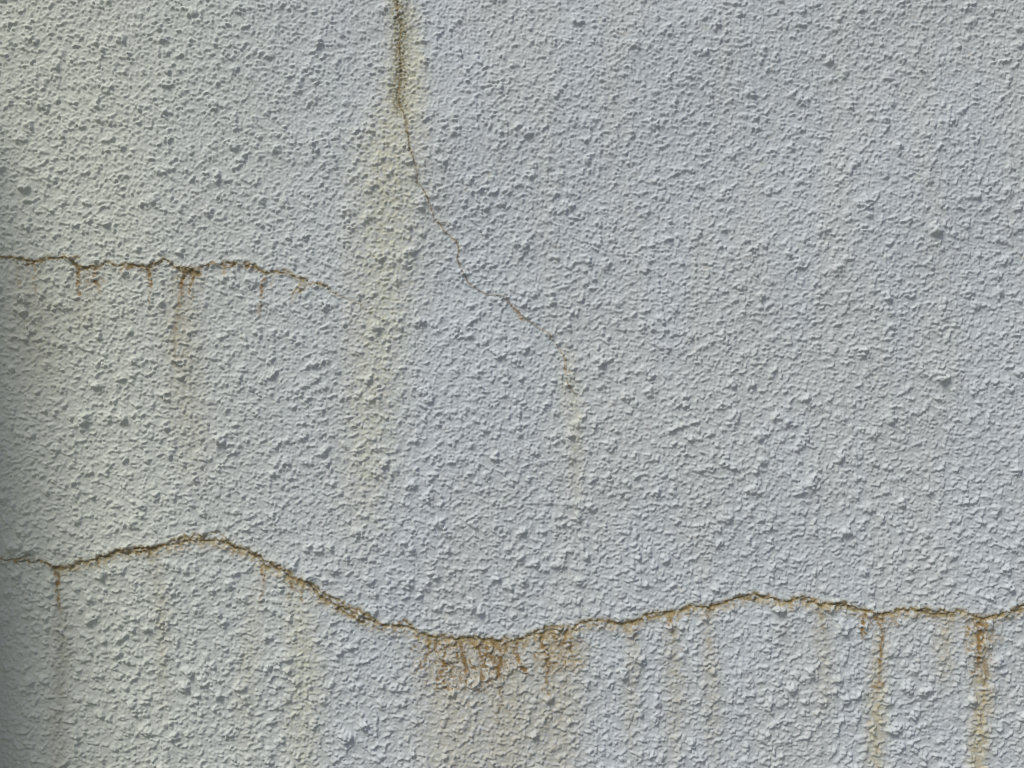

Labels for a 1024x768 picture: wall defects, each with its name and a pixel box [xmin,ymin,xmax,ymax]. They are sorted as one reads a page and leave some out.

crack [383,0,577,397]
crack [0,251,388,321]
crack [0,529,1024,653]
rust [385,630,592,727]
rust [852,609,901,691]
rust [922,606,1007,693]